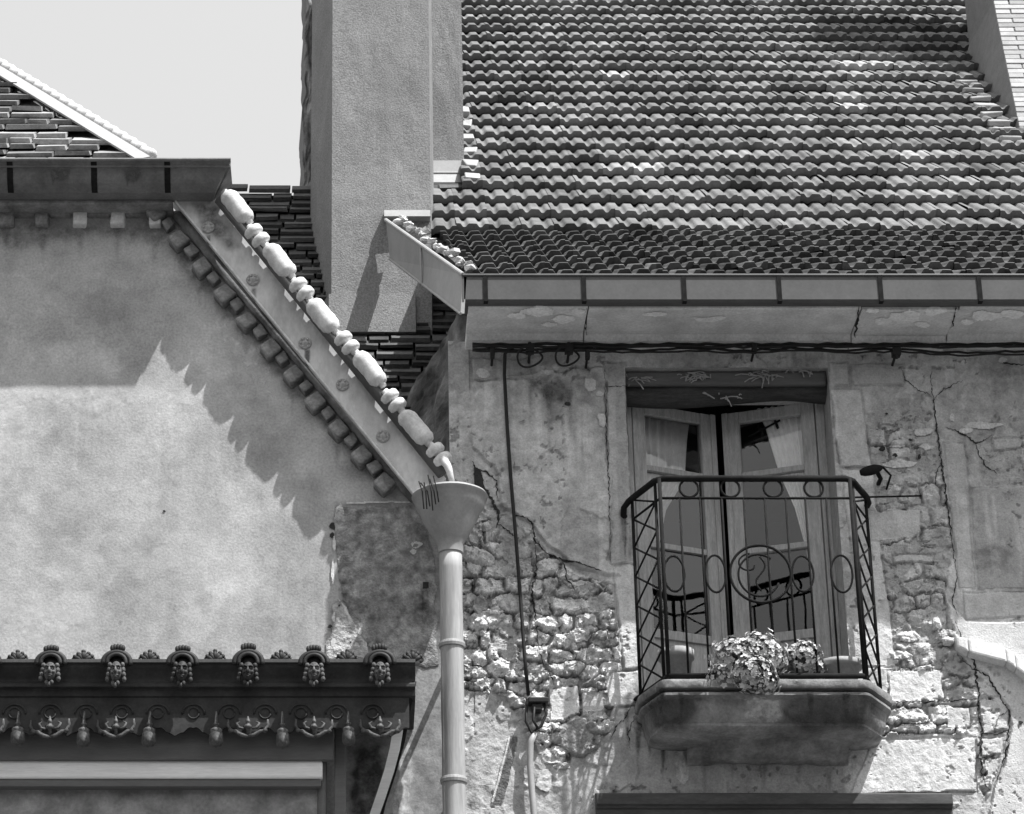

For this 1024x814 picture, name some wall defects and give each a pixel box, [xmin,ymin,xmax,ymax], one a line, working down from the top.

spalling [879,427,935,468]
flaking render [950,414,1004,434]
spalling [467,522,495,575]
crack [472,364,624,684]
flaking render [326,501,439,667]
crack [894,369,1011,792]
spalling [471,652,509,672]
spalling [532,605,598,660]
spalling [889,616,954,660]
spalling [898,711,951,724]
spalling [492,735,518,804]
flaking render [535,755,570,791]